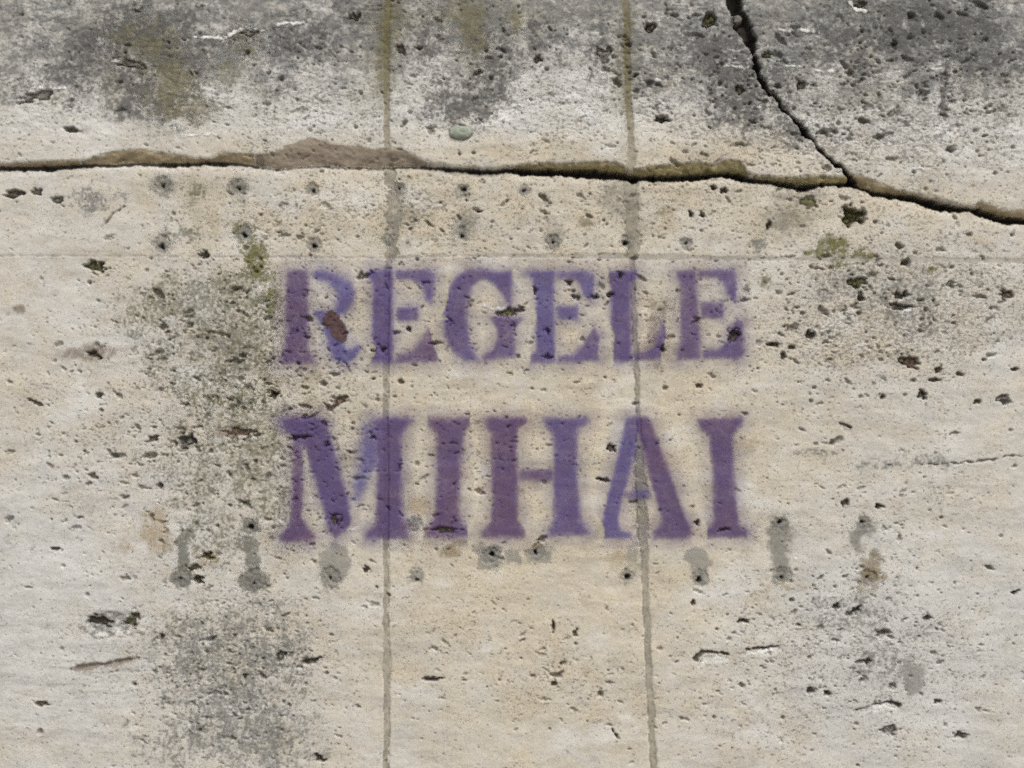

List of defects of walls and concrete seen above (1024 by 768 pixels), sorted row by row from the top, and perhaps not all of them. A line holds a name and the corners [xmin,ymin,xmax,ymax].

crack [0,162,279,172]
crack [323,0,1024,225]